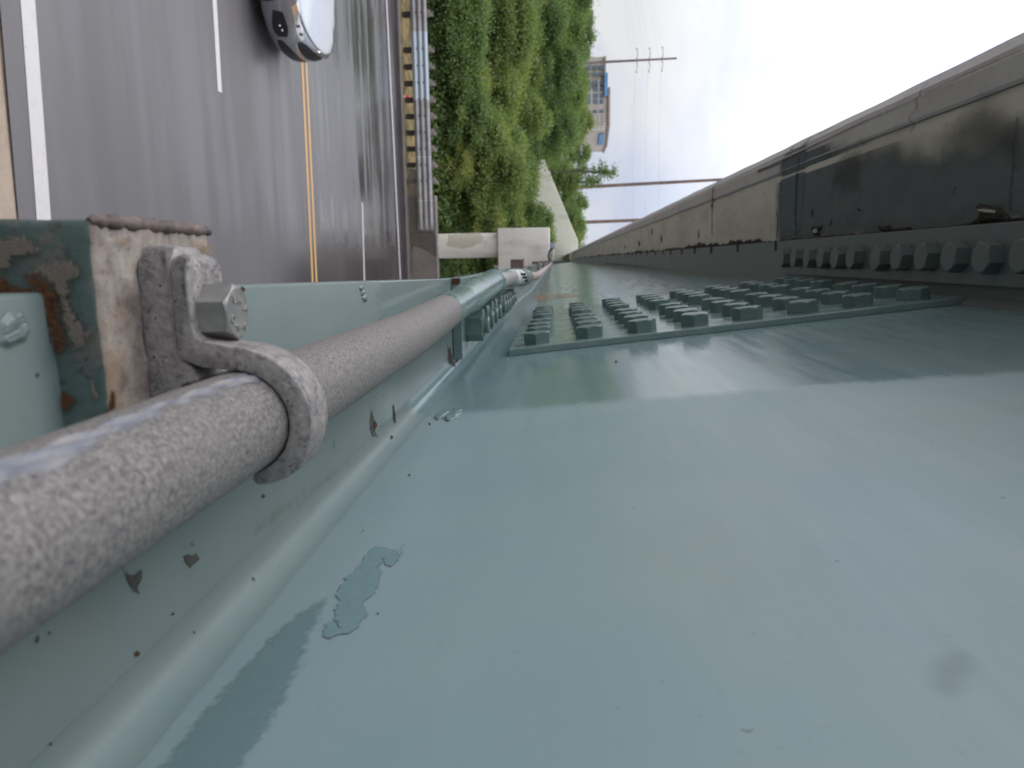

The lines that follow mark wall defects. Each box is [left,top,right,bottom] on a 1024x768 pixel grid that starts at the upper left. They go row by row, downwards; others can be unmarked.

spalling [963,203,1009,224]
corrosion [0,273,70,354]
peeling [0,232,90,349]
peeling [164,543,404,768]